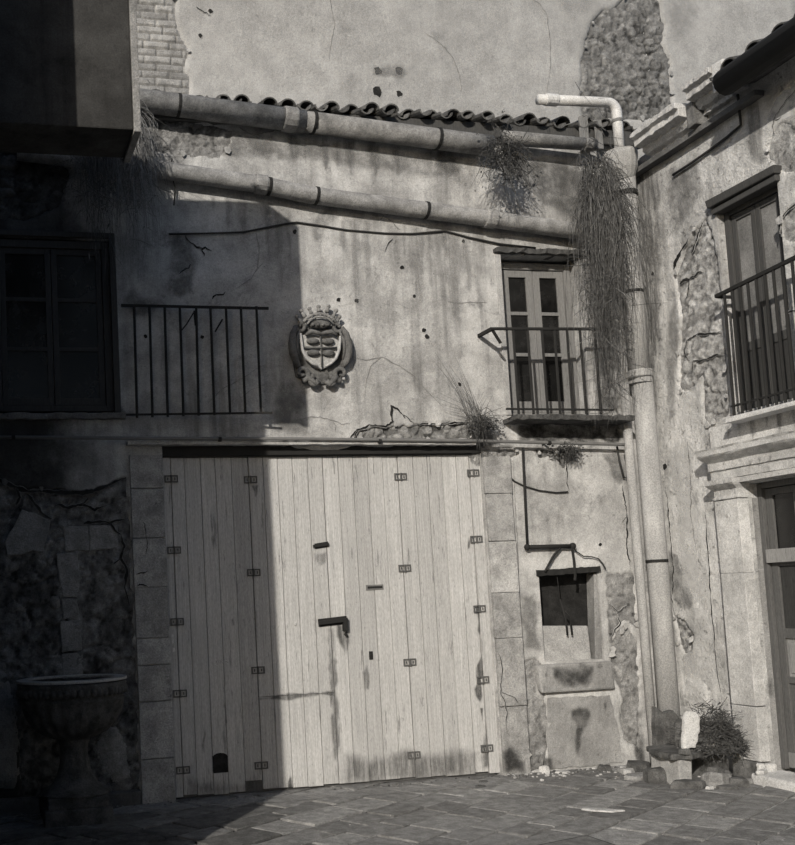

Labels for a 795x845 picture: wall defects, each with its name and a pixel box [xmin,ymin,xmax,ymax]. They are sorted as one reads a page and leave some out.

spalling [579,0,675,121]
spalling [141,120,232,159]
spalling [775,207,795,243]
crack [778,204,795,234]
spalling [673,220,729,428]
crack [303,356,469,438]
spalling [0,478,141,803]
water stain [555,669,592,685]
spalling [606,573,639,746]